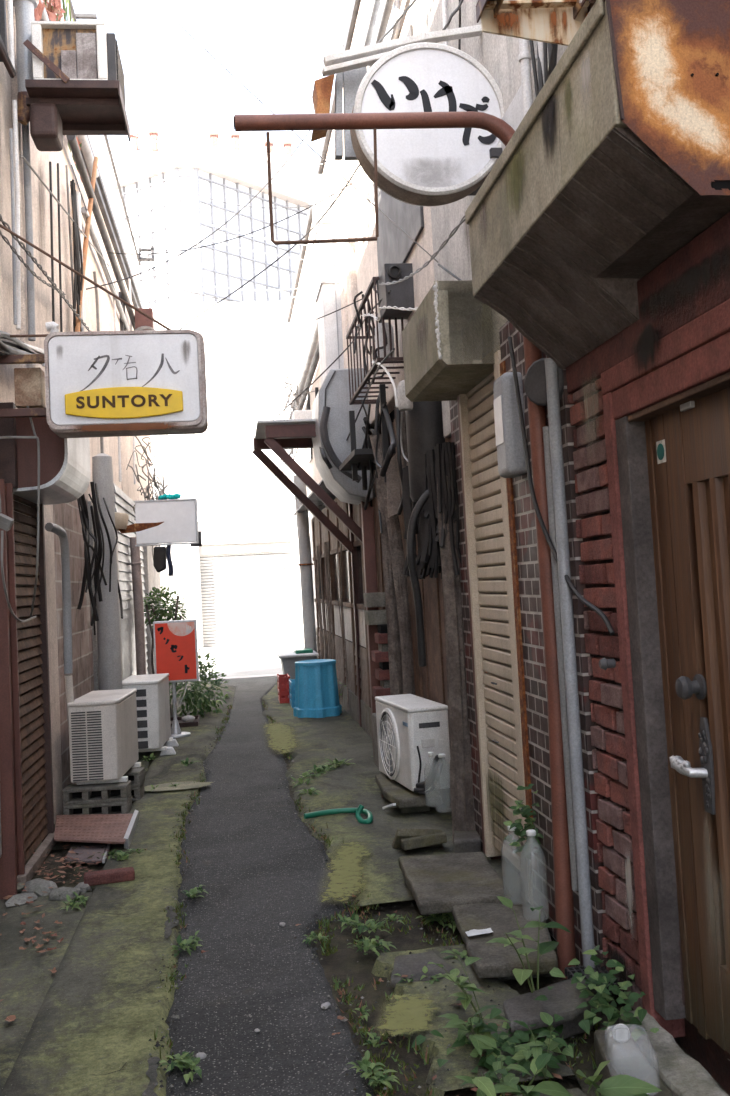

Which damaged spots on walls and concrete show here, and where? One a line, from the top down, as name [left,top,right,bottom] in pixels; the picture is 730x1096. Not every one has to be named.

corrosion [494,12,520,30]
corrosion [550,11,567,30]